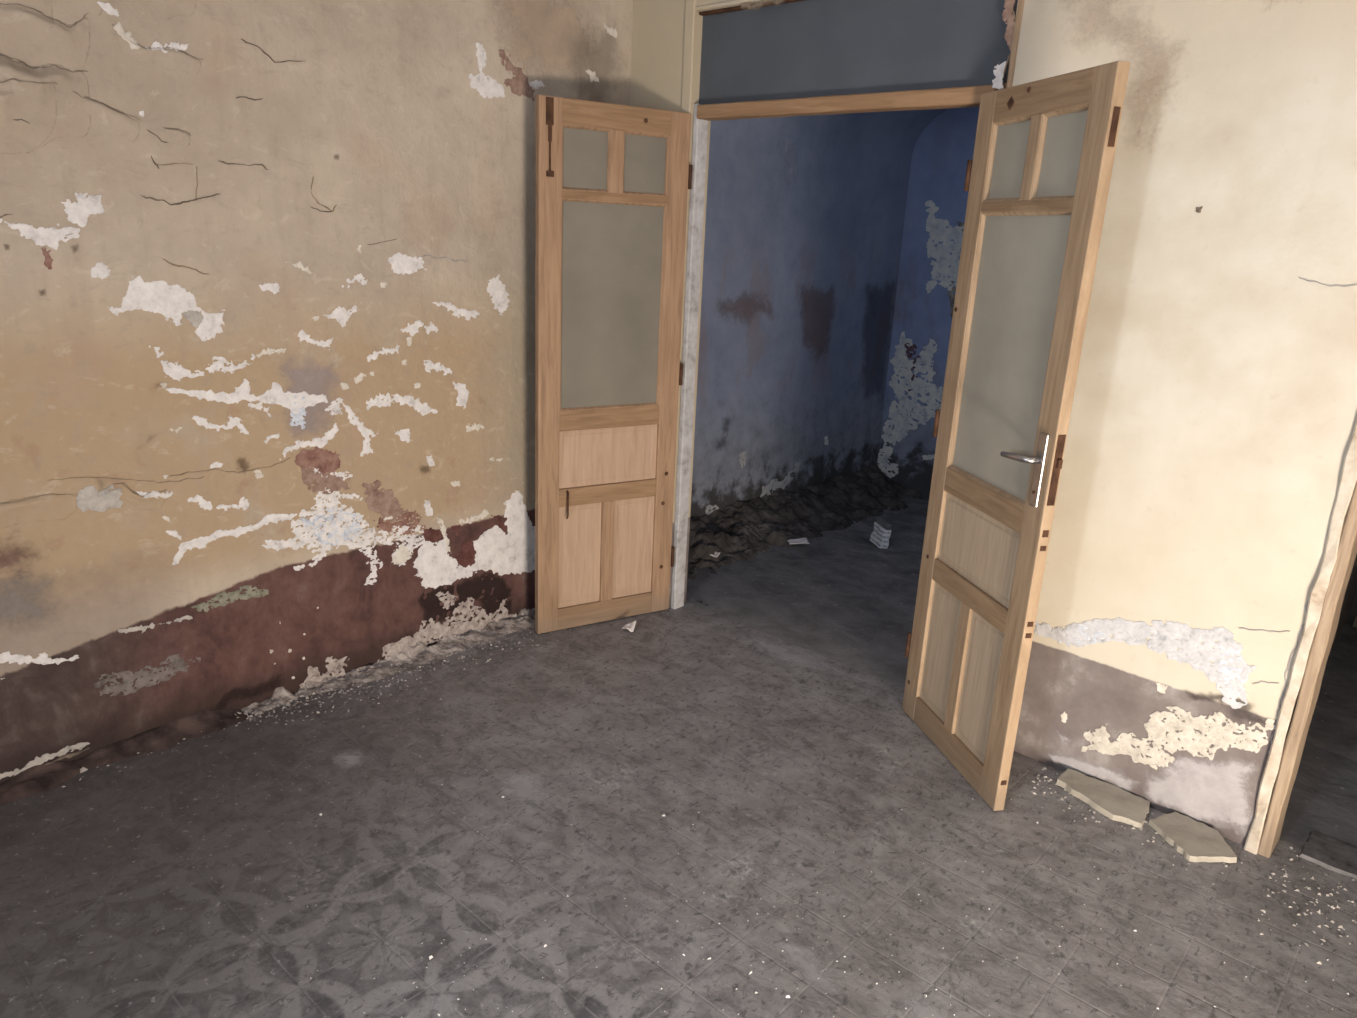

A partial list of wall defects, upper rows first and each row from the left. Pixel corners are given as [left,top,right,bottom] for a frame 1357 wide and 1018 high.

crack [241,39,302,63]
crack [141,156,269,205]
peeling [0,192,104,250]
peeling [108,275,225,341]
water stain [802,289,833,354]
flaking render [149,320,535,589]
water stain [262,500,425,585]
water stain [419,573,517,635]
peeling [0,651,79,680]
water stain [217,679,278,710]
flaking render [270,649,350,693]
peeling [1034,617,1276,770]